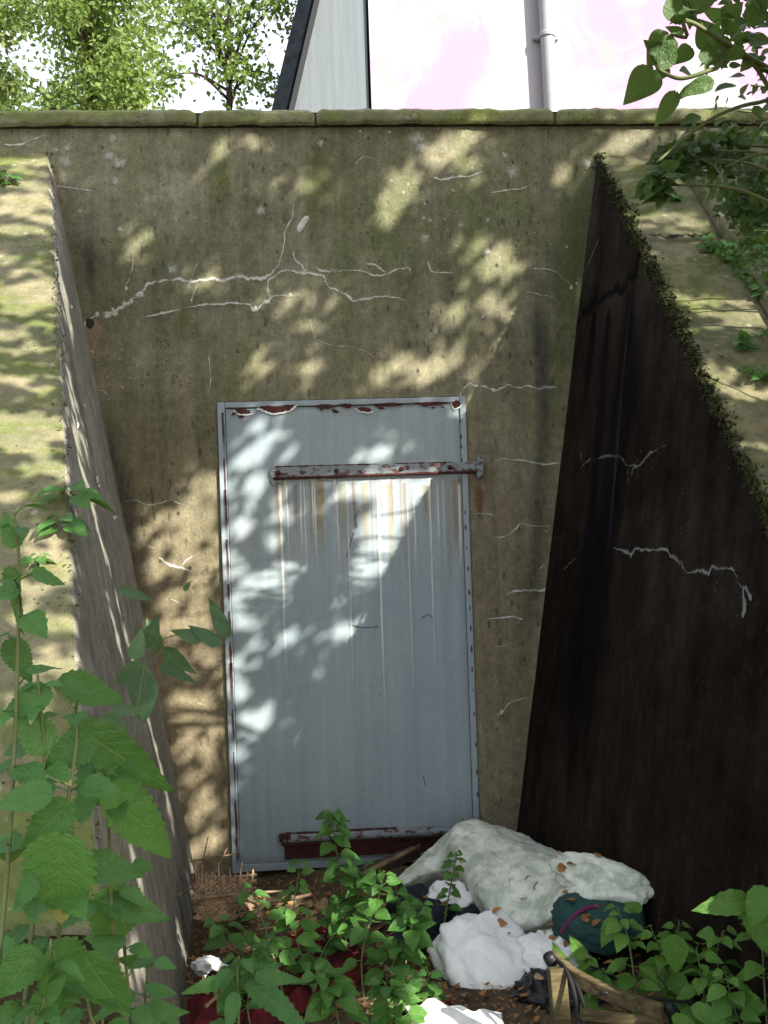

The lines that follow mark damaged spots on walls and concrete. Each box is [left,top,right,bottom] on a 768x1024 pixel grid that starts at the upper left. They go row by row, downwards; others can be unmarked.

crack [84,204,454,353]
crack [460,383,557,396]
crack [496,445,666,484]
crack [476,513,543,538]
crack [614,547,752,618]
rust [279,827,444,846]